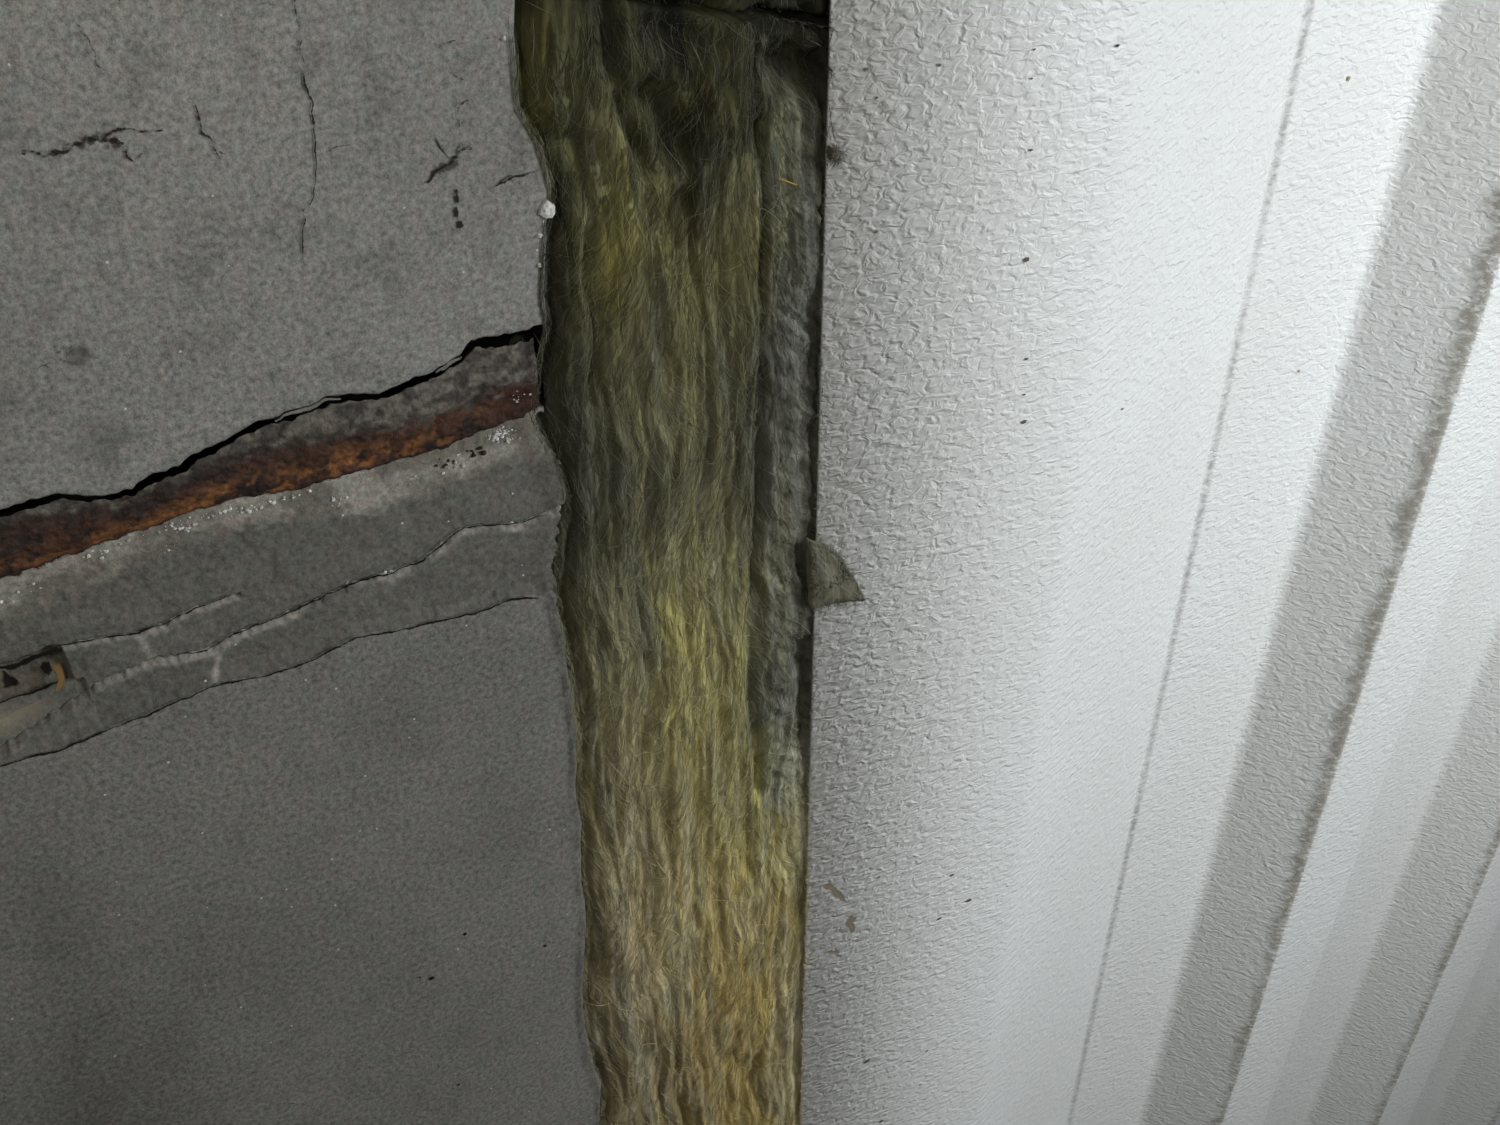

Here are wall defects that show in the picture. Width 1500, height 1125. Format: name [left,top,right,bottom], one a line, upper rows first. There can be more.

crack [22,128,163,162]
crack [193,102,224,158]
crack [294,0,350,263]
rust [53,664,65,691]
crack [0,514,548,767]
spalling [0,325,567,767]